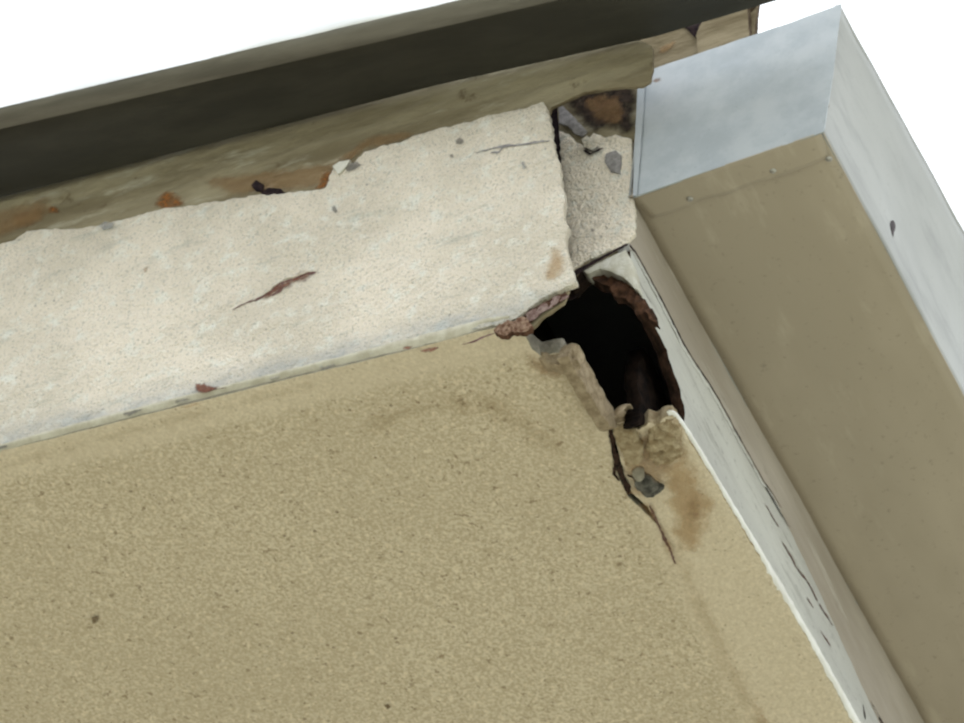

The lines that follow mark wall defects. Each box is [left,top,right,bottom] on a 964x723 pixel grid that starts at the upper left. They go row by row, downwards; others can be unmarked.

crack [476,108,561,163]
peeling [332,160,360,175]
corrosion [157,192,182,208]
spalling [539,343,683,498]
crack [568,244,833,646]